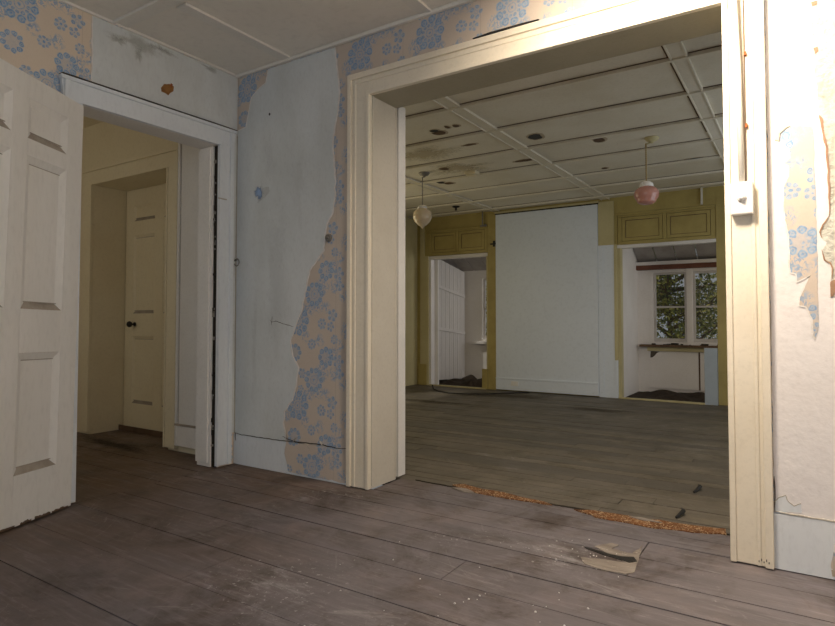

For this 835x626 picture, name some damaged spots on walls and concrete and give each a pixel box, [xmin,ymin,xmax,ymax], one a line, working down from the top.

flaking render [161,83,174,95]
peeling [235,47,340,442]
peeling [765,0,835,521]